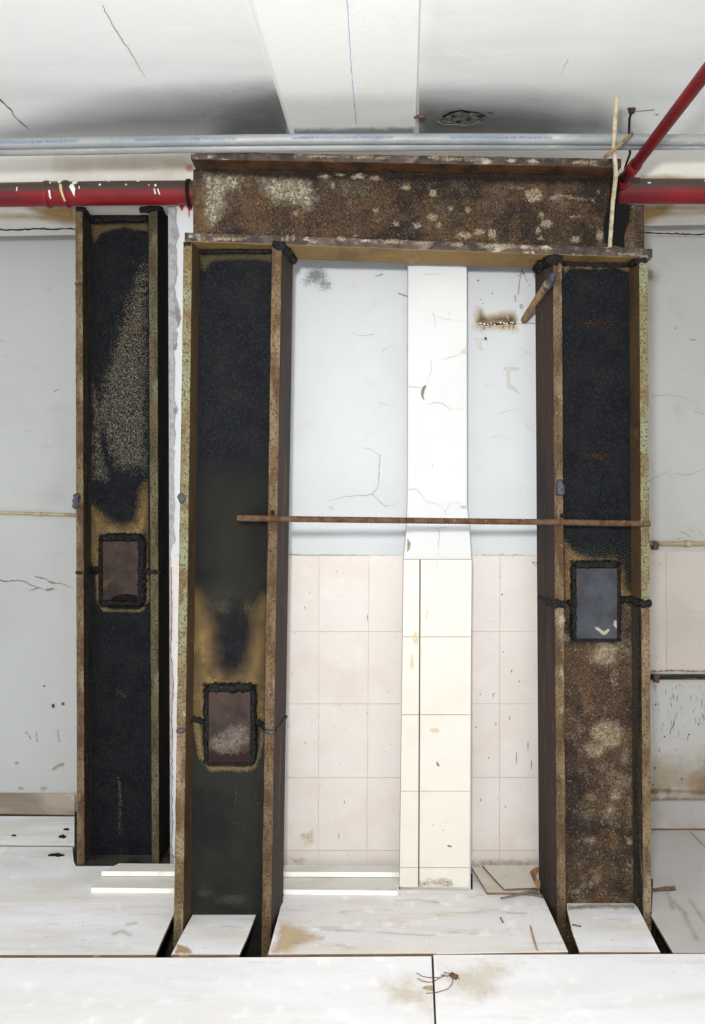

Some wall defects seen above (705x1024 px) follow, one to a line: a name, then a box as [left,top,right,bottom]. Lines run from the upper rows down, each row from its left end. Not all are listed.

crack [103,6,145,76]
crack [329,448,466,570]
crack [0,576,68,591]
damp [193,608,264,771]